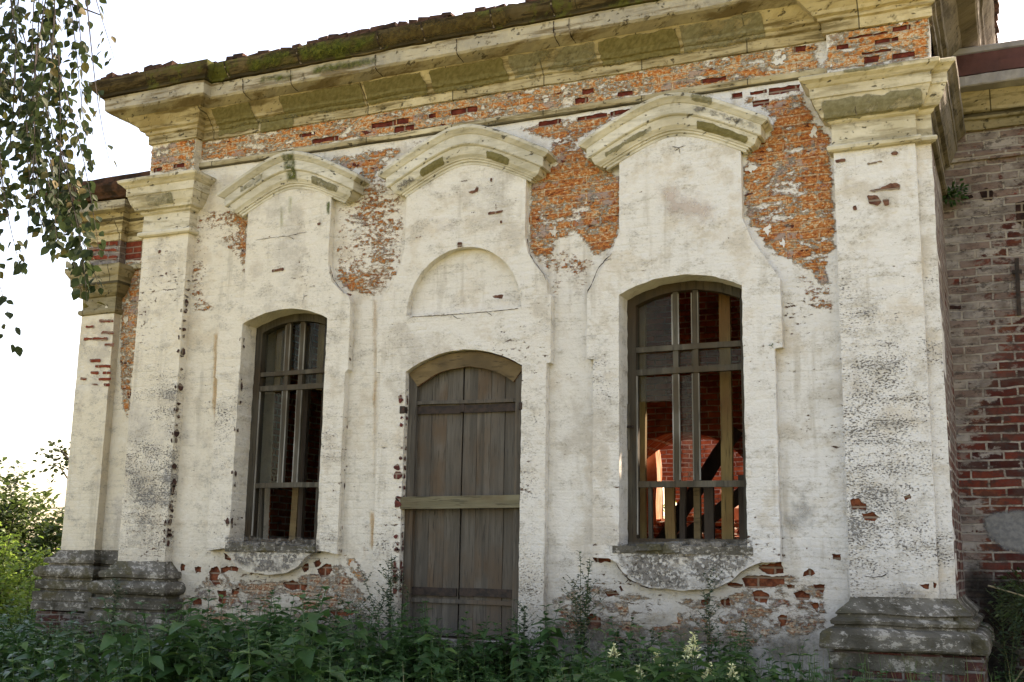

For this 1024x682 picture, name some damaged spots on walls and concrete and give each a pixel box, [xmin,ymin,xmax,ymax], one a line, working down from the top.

water stain [126,0,962,146]
flaking render [150,12,932,309]
flaking render [80,241,142,415]
flaking render [171,211,248,443]
spalling [163,463,177,546]
flaking render [851,498,879,521]
flaking render [182,549,370,631]
flaking render [552,562,826,647]